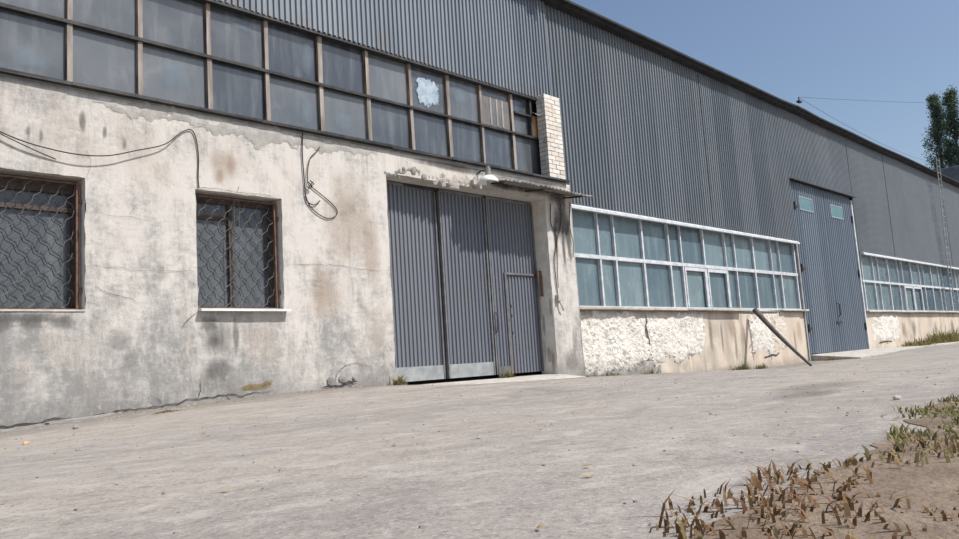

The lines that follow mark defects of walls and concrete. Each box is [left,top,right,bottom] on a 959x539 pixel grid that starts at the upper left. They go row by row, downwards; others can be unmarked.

flaking render [90,98,378,156]
spalling [384,166,479,191]
spalling [580,310,706,377]
spalling [747,311,787,355]
spalling [870,314,900,342]
crack [0,382,273,428]